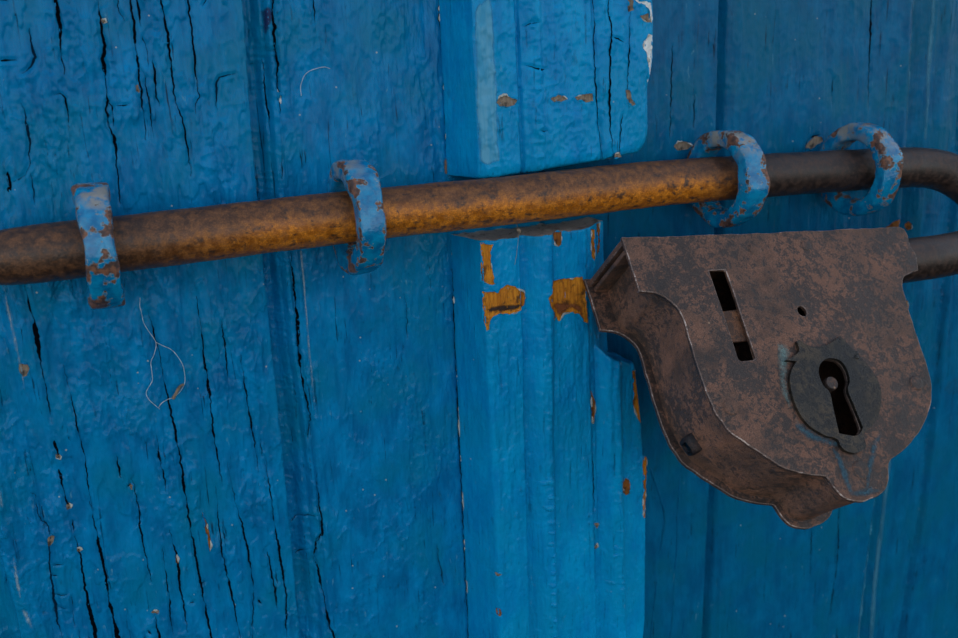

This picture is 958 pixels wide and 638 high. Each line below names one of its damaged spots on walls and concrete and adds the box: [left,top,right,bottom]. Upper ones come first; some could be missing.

crack [98,0,206,204]
peeling [496,93,519,108]
peeling [551,92,594,103]
crack [592,0,631,154]
peeling [628,0,653,82]
crack [290,253,311,435]
peeling [480,242,526,331]
peeling [549,276,589,323]
peeling [591,223,601,268]
crack [25,289,121,638]
crack [117,317,212,638]
crack [196,296,288,638]